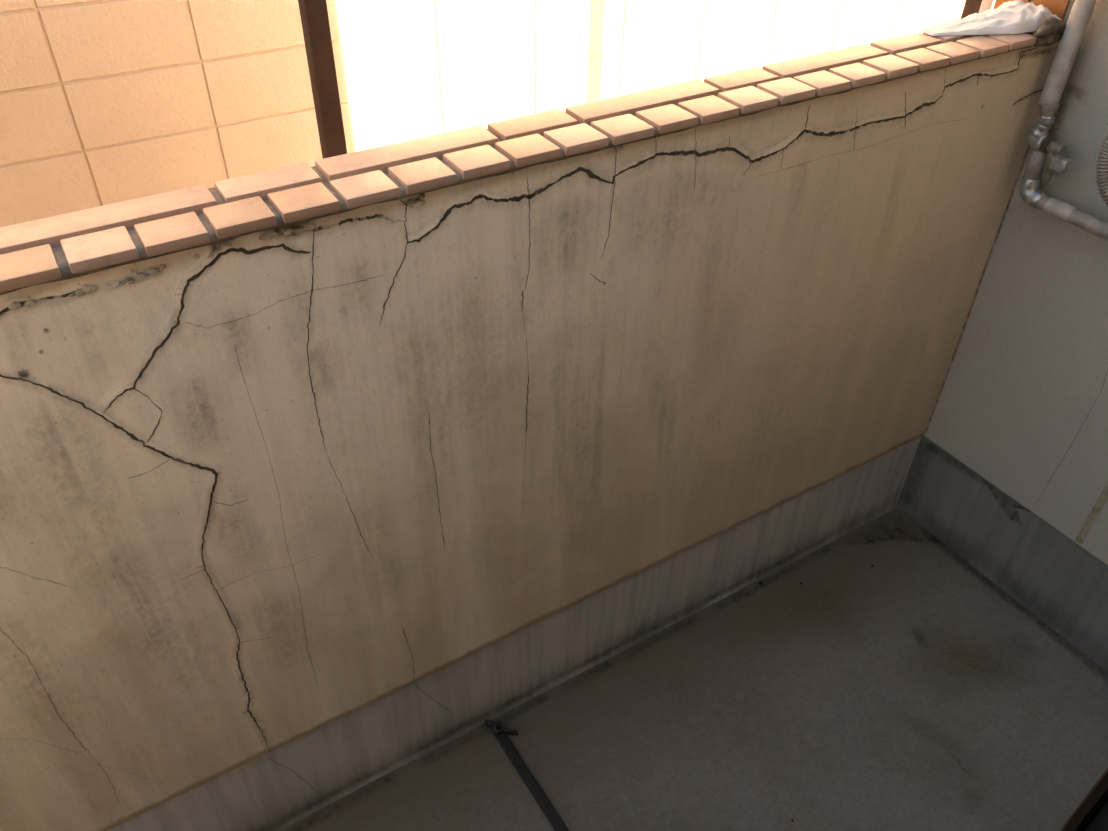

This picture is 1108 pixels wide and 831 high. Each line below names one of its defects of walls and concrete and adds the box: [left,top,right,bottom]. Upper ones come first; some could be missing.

crack [0,46,1040,752]